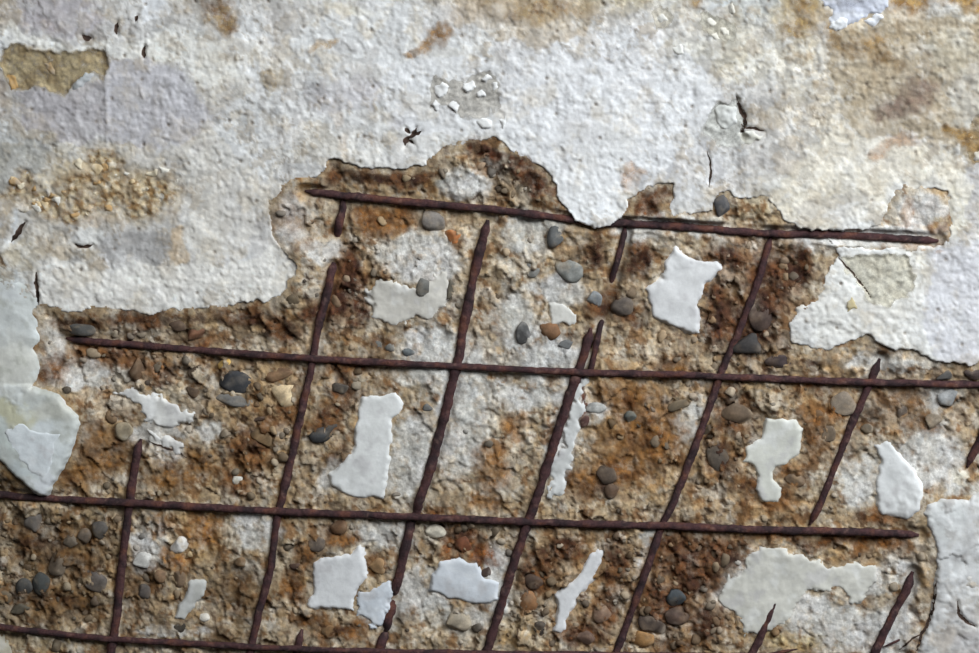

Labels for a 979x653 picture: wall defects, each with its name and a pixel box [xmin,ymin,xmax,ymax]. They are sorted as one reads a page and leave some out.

peeling [821,0,889,31]
peeling [0,43,109,96]
corrosion [328,169,434,236]
corrosion [59,311,169,331]
corrosion [214,248,370,341]
corrosion [713,247,811,319]
spalling [0,136,979,653]
corrosion [565,380,685,499]
corrosion [761,464,801,512]
corrosion [523,538,584,592]
corrosion [560,540,630,646]
corrosion [639,534,743,638]